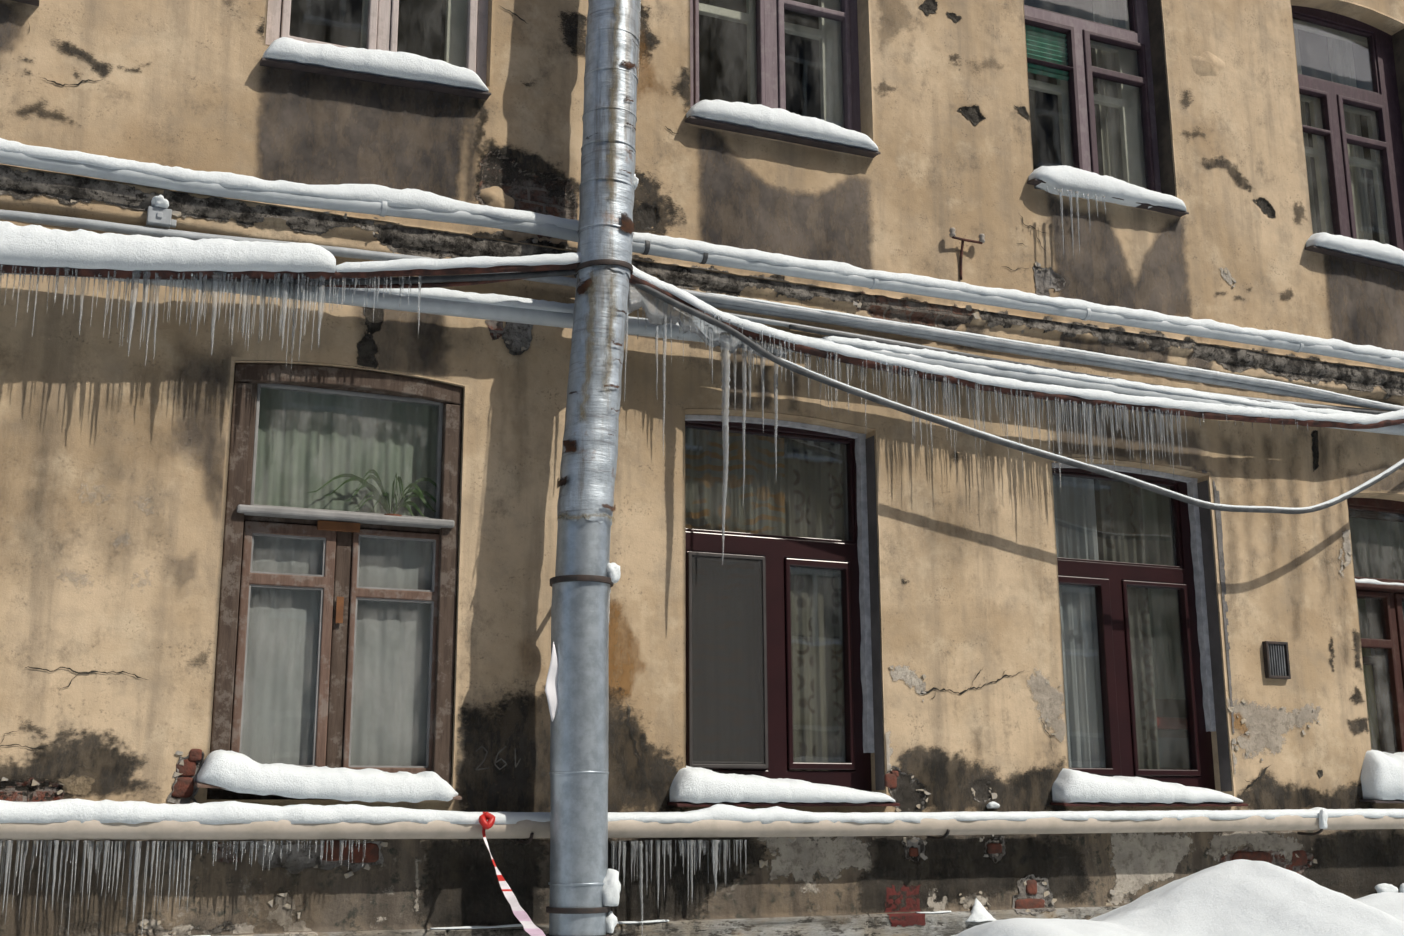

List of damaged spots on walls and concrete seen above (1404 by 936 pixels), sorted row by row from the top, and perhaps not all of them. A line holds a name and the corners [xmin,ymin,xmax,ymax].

flaking render [957,104,986,125]
flaking render [475,151,579,220]
crack [25,667,147,689]
crack [921,669,1023,700]
flaking render [0,775,95,802]
water stain [0,722,153,802]
flaking render [167,749,204,804]
water stain [456,684,551,812]
water stain [608,687,688,812]
peeling [1227,698,1322,774]
water stain [1237,768,1374,810]
peeling [1105,831,1317,905]